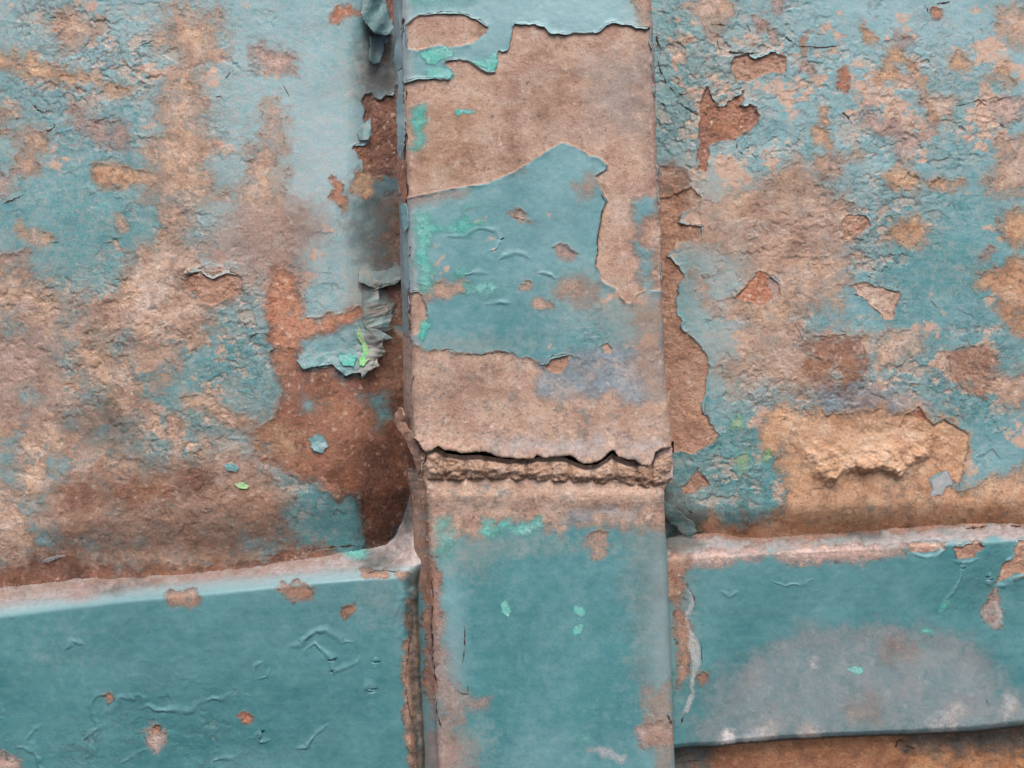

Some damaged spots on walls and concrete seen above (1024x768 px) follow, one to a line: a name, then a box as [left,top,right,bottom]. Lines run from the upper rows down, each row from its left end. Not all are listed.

peeling [695,50,787,170]
peeling [841,212,872,239]
peeling [297,0,718,494]
peeling [181,270,243,306]
peeling [736,271,781,305]
peeling [852,282,900,320]
rust [0,0,674,768]
rust [658,106,1024,684]
crack [413,438,674,468]
peeling [664,501,697,536]
peeling [908,540,985,560]
peeling [996,538,1024,583]